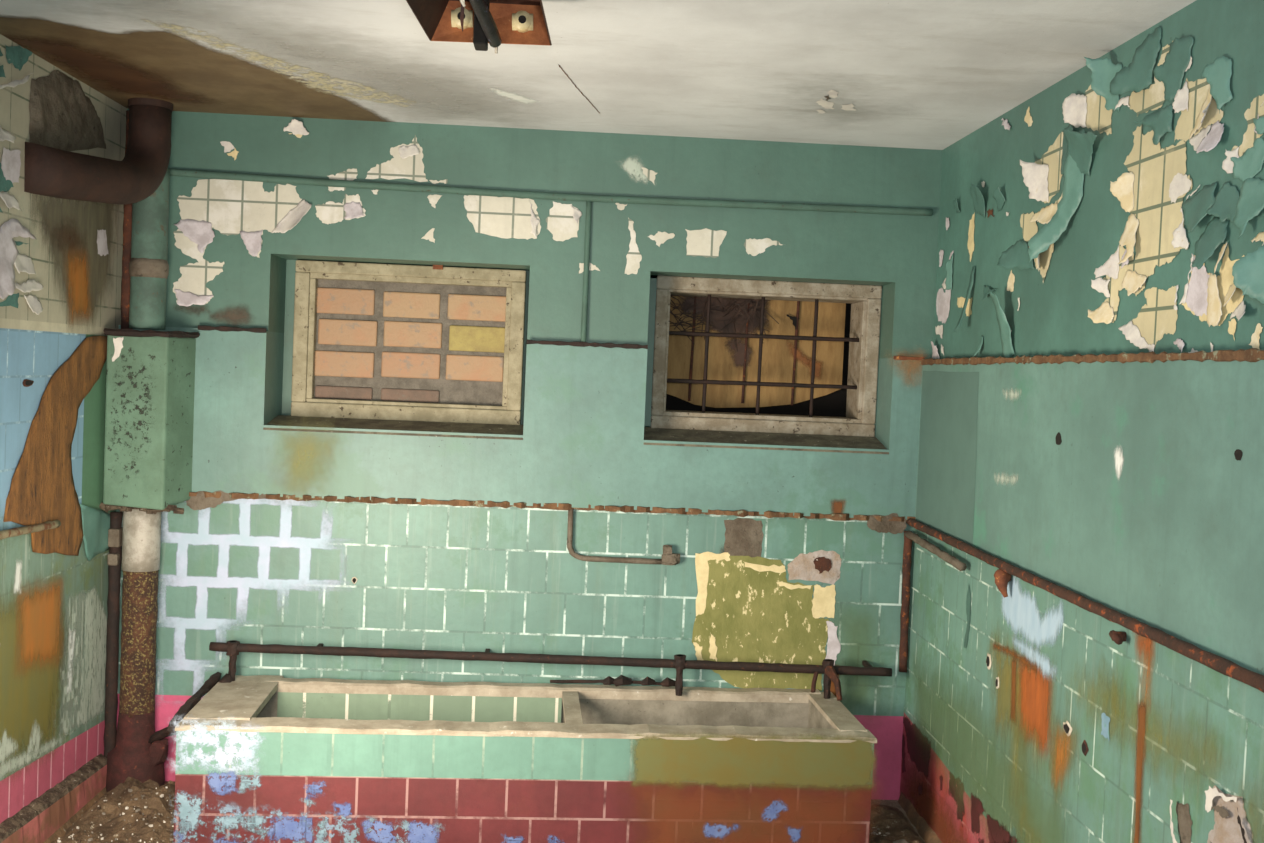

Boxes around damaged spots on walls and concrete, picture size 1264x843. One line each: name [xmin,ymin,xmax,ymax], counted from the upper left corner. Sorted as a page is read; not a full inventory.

damp [0,16,391,122]
flaking render [0,45,106,315]
peeling [464,195,582,241]
peeling [615,203,727,275]
peeling [931,27,1264,359]
rust [0,585,64,763]
peeling [158,490,337,733]
peeling [173,771,440,843]
peeling [692,518,842,691]
rust [993,643,1071,789]
peeling [1002,578,1063,677]
rust [1134,637,1151,843]